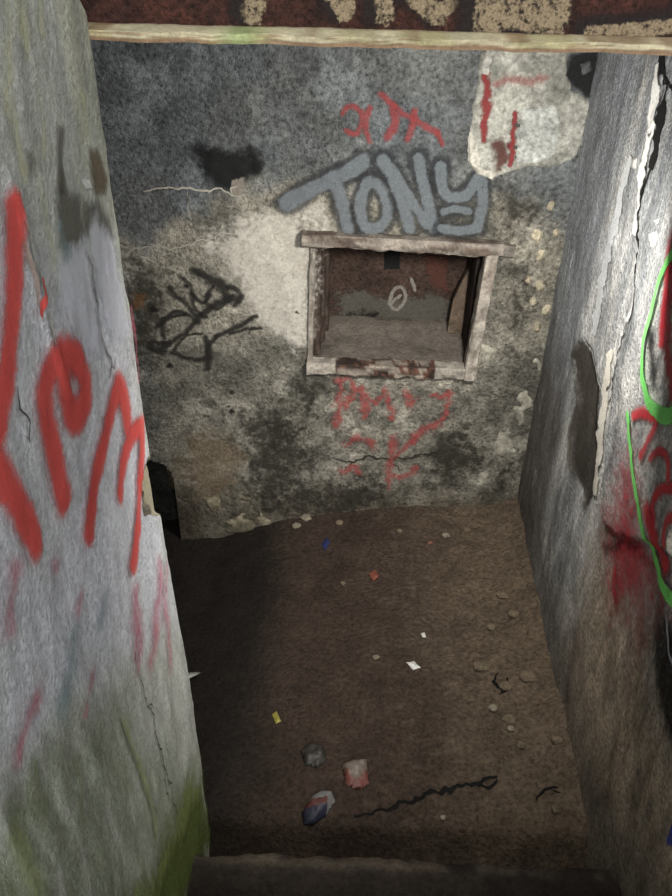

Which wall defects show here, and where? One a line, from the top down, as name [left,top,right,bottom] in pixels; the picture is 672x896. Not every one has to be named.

crack [634,55,672,287]
crack [336,449,451,471]
crack [135,659,178,813]
crack [354,775,498,818]